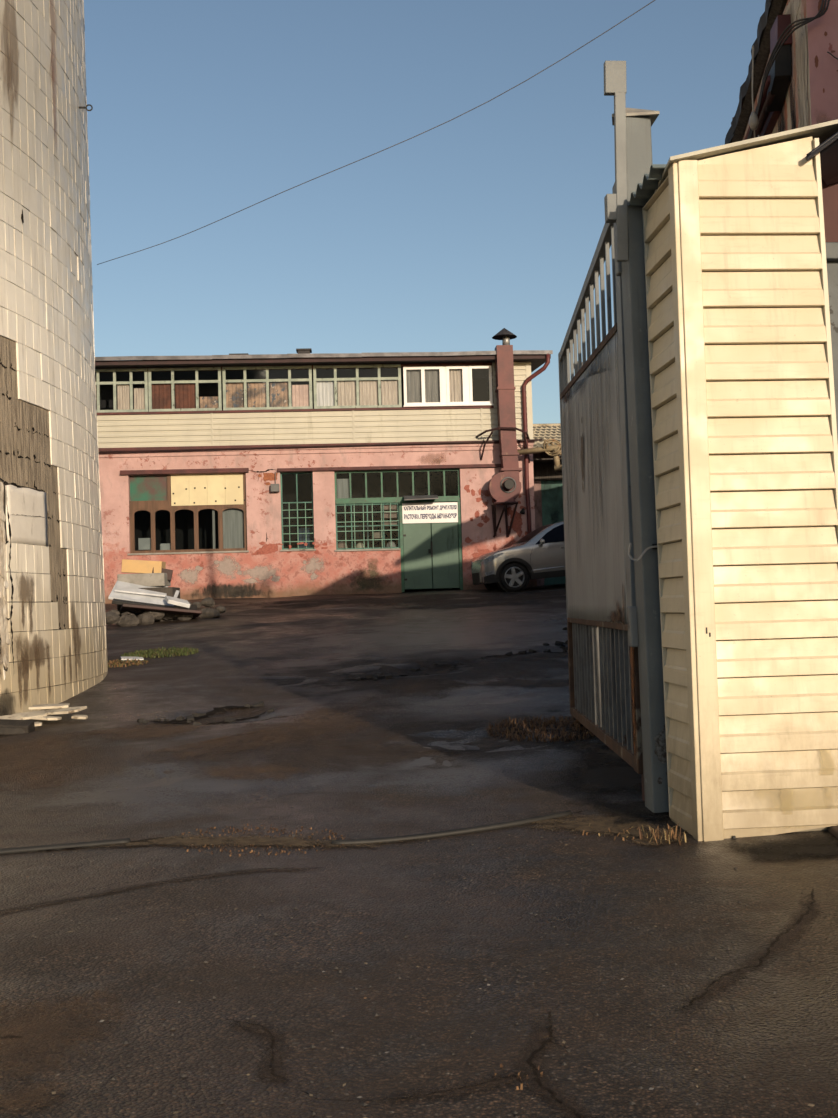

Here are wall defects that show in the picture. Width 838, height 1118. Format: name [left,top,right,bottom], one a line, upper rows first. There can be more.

spalling [0,336,69,694]
flaking render [180,542,328,584]
peeling [464,485,528,579]
leakage [0,575,51,716]
leakage [64,610,81,686]
crack [674,889,835,1012]
crack [229,1012,594,1118]